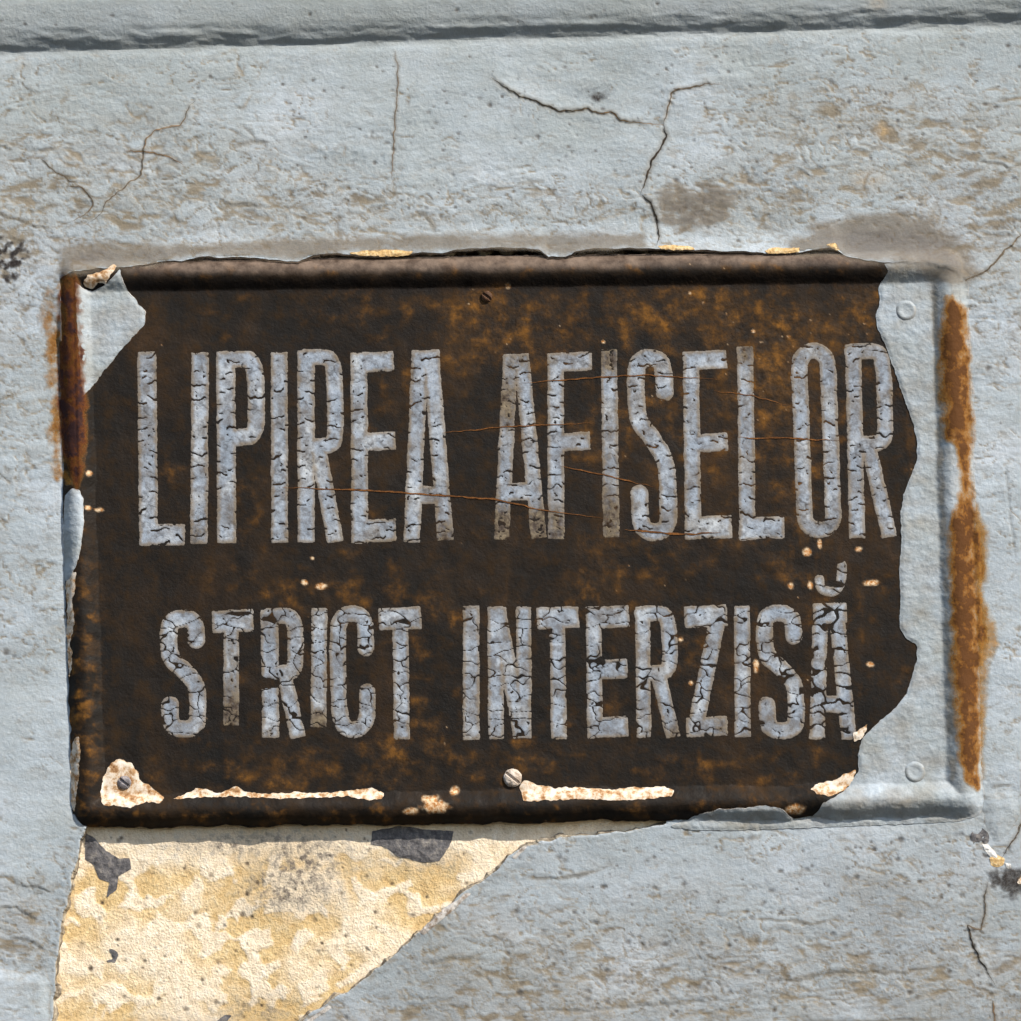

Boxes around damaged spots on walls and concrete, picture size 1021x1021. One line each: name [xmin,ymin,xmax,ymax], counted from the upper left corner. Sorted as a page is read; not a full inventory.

crack [491,77,719,243]
rust [44,276,88,489]
spalling [55,261,984,1021]
rust [937,295,998,791]
crack [967,884,996,1021]
spalling [971,828,1021,896]